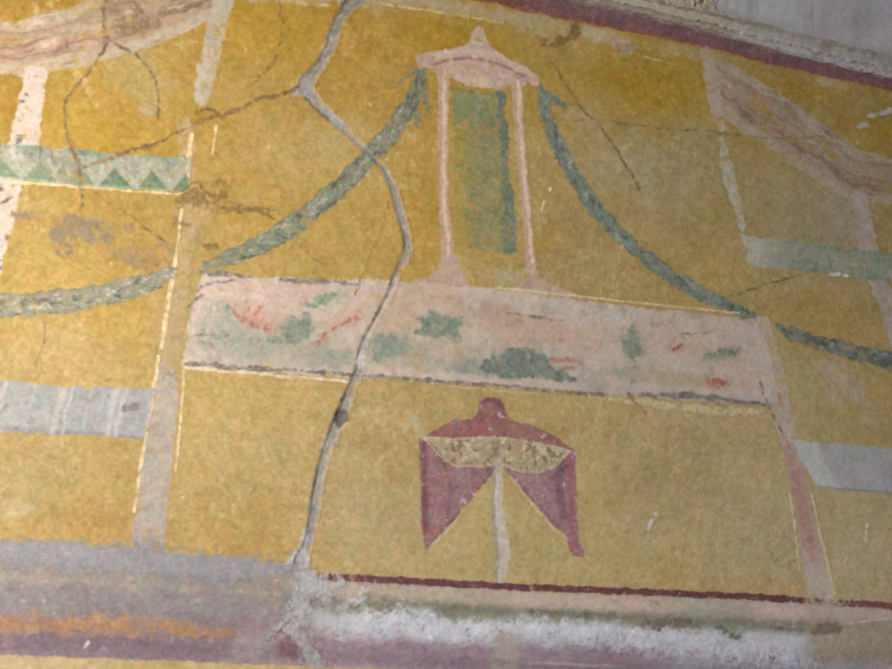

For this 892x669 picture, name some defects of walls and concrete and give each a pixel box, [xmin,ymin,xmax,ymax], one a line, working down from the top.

crack [532,16,827,195]
crack [61,0,414,669]
leakage [290,569,825,669]